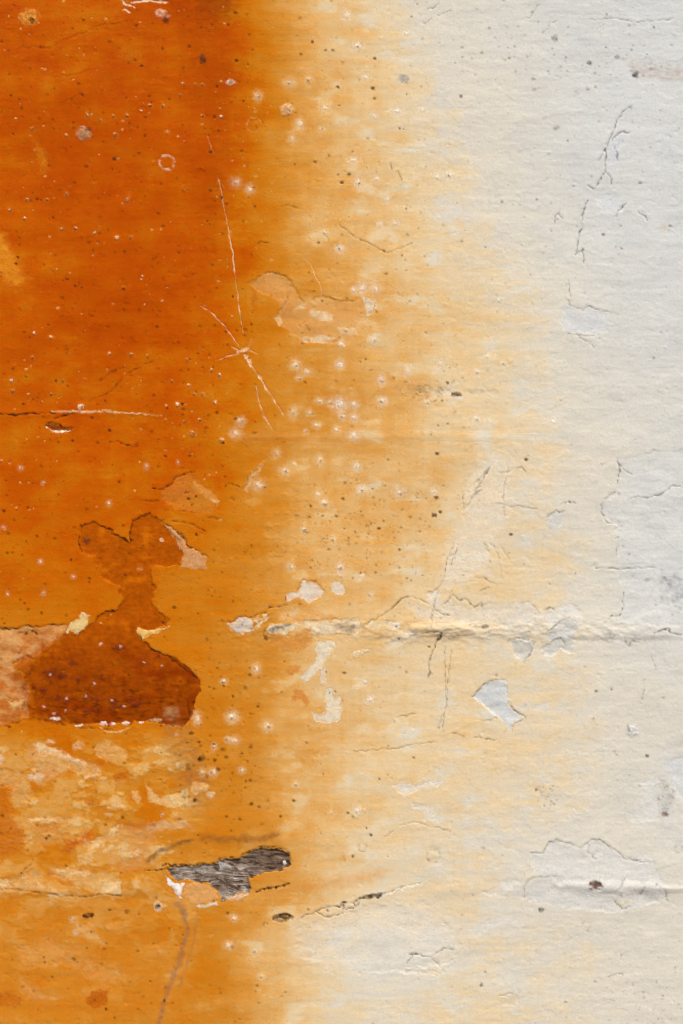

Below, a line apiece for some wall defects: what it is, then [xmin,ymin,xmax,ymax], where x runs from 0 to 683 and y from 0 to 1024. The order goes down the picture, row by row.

corrosion [0,0,445,1024]
peeling [292,583,341,600]
peeling [0,514,205,757]
peeling [474,680,520,730]
spalling [167,848,291,907]